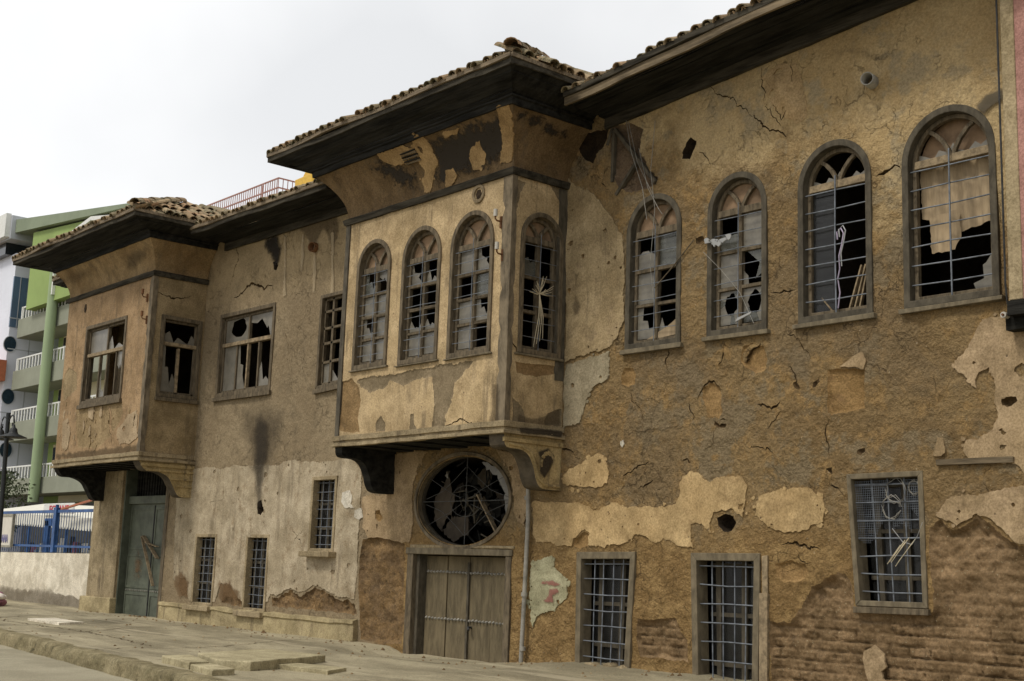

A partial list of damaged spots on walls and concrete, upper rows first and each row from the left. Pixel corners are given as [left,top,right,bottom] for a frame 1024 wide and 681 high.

peeling [377,133,458,193]
peeling [469,141,486,171]
peeling [496,105,515,164]
spalling [610,123,658,193]
crack [711,67,803,155]
crack [234,279,274,298]
peeling [515,178,636,429]
spalling [340,360,473,433]
spalling [769,313,1024,681]
peeling [173,450,428,644]
peeling [497,450,828,627]